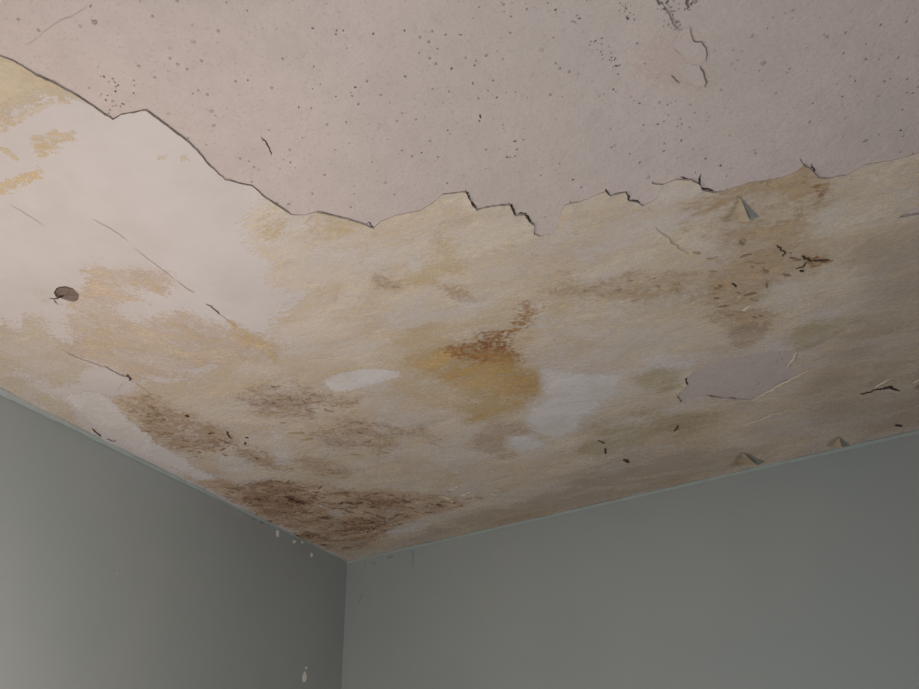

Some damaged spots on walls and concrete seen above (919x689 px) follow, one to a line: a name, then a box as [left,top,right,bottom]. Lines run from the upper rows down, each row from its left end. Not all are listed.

crack [656,0,690,31]
peeling [0,0,919,236]
crack [92,219,235,326]
crack [776,245,828,272]
spalling [50,286,79,303]
crack [69,354,150,394]
water stain [0,154,919,560]